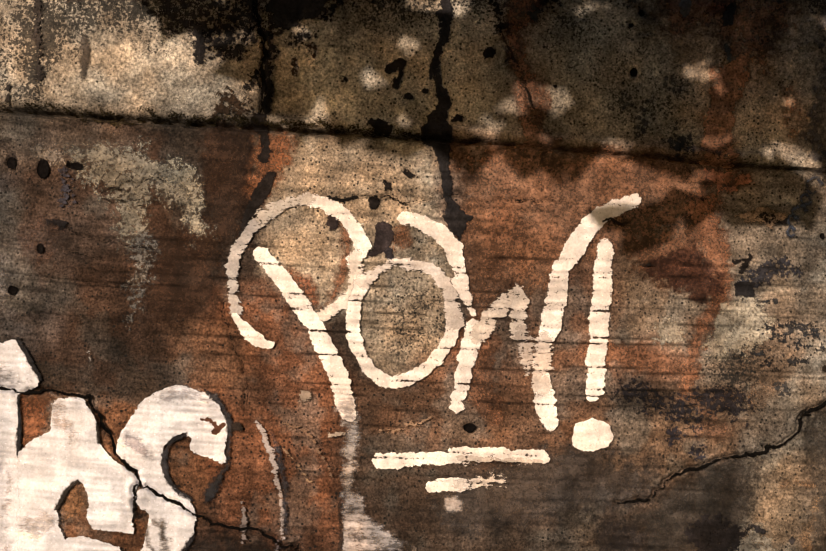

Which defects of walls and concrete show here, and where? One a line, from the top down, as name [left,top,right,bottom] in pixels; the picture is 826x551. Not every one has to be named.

damp [210,68,260,120]
damp [140,0,360,67]
crack [244,0,269,113]
rust [448,0,808,441]
crack [221,302,248,409]
crack [0,386,300,551]
crack [617,401,826,504]